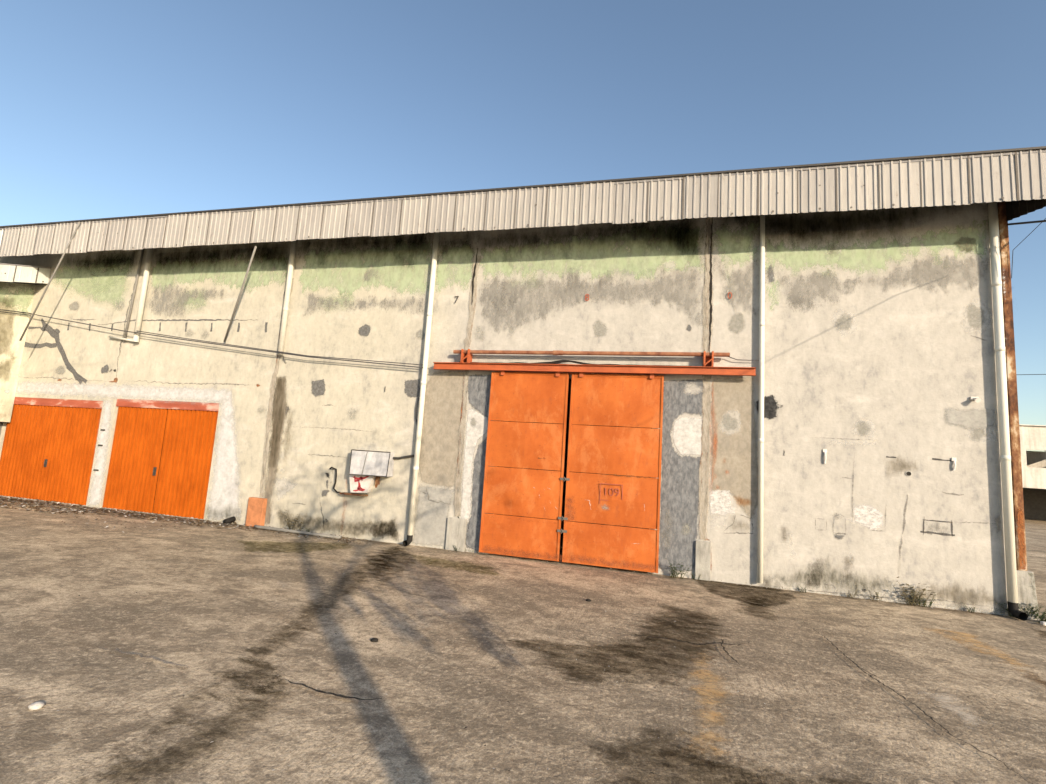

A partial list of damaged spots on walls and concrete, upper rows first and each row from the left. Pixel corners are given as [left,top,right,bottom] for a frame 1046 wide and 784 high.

leakage [303,233,428,252]
leakage [586,218,697,251]
leakage [723,206,948,239]
leakage [265,377,287,524]
crack [803,621,1033,784]